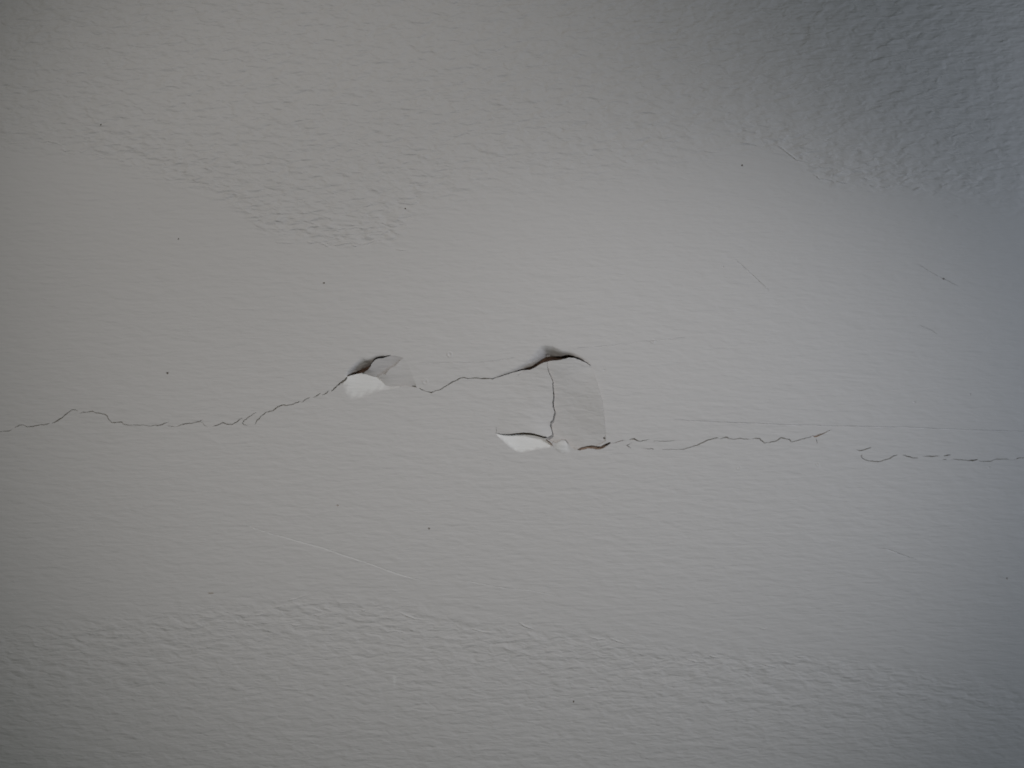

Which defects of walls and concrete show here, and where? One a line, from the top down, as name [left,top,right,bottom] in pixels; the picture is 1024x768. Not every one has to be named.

crack [0,377,347,432]
spalling [343,355,416,399]
crack [414,355,584,437]
spalling [496,429,554,453]
crack [614,430,830,450]
crack [858,447,1024,462]